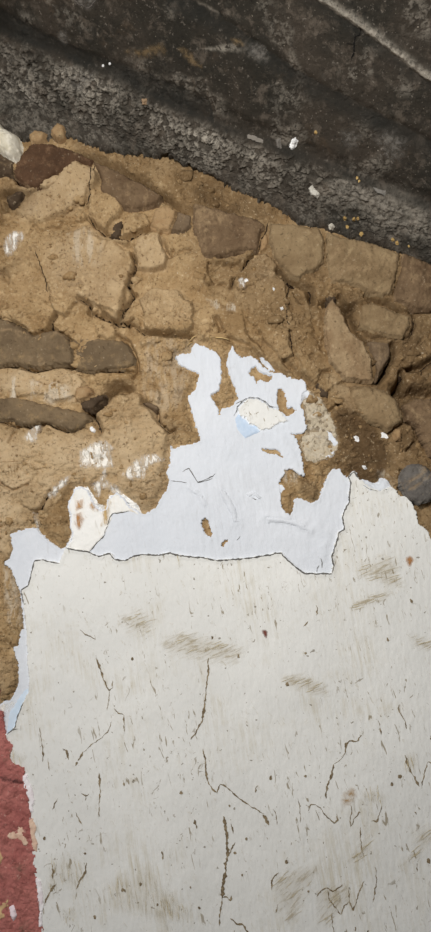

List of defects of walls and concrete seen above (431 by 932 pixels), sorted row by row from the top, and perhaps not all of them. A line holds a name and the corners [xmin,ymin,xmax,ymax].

crack [81,166,191,340]
spalling [0,137,431,734]
peeling [0,900,17,921]
peeling [7,774,38,852]
crack [44,863,87,904]
crack [39,632,125,768]
crack [76,774,101,824]
crack [219,816,248,932]
crack [191,658,277,825]
crack [298,721,382,932]
crack [405,756,431,786]